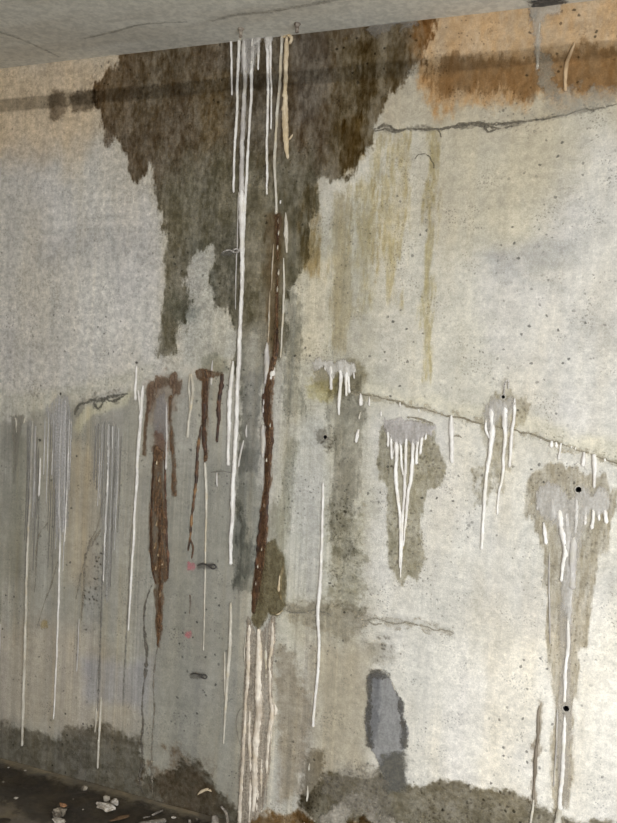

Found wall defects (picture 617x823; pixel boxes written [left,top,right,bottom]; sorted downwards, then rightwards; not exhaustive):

crack [374,105,613,137]
leakage [10,393,72,765]
rust [143,372,182,647]
rust [188,369,224,559]
leakage [223,602,278,823]
leakage [72,19,437,651]
rust [252,214,281,614]
rust [251,811,314,823]
spalling [363,669,409,798]
leakage [300,439,609,823]
crack [355,393,617,464]
leakage [480,398,517,550]